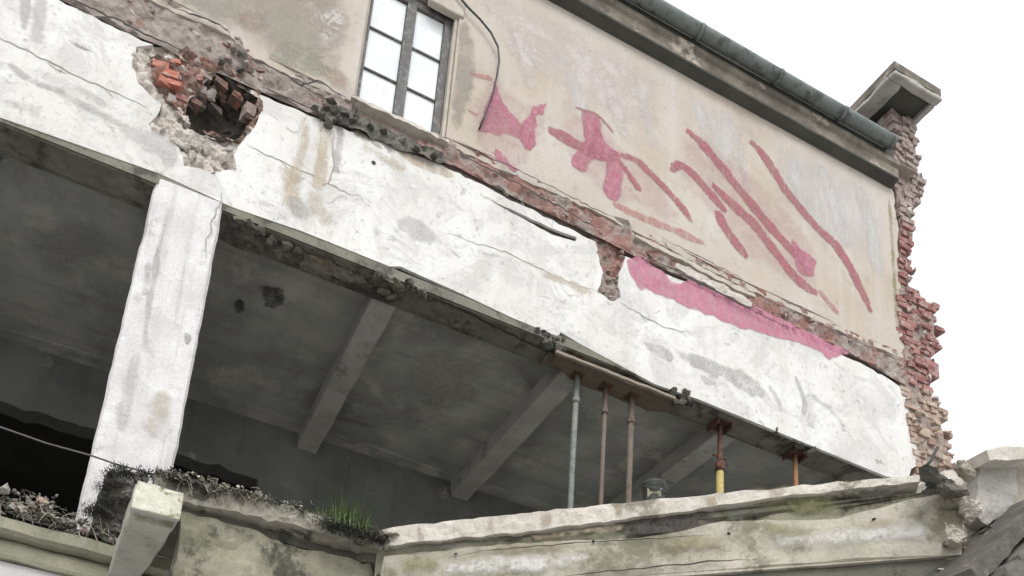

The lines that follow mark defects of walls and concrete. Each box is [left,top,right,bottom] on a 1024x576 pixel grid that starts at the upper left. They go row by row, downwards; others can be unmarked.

crack [0,38,147,108]
spalling [131,43,263,173]
crack [252,129,360,196]
crack [451,142,630,233]
crack [205,193,222,259]
leakage [145,248,159,331]
spalling [262,286,283,308]
spalling [372,270,427,301]
spalling [590,232,625,301]
spalling [940,470,968,500]